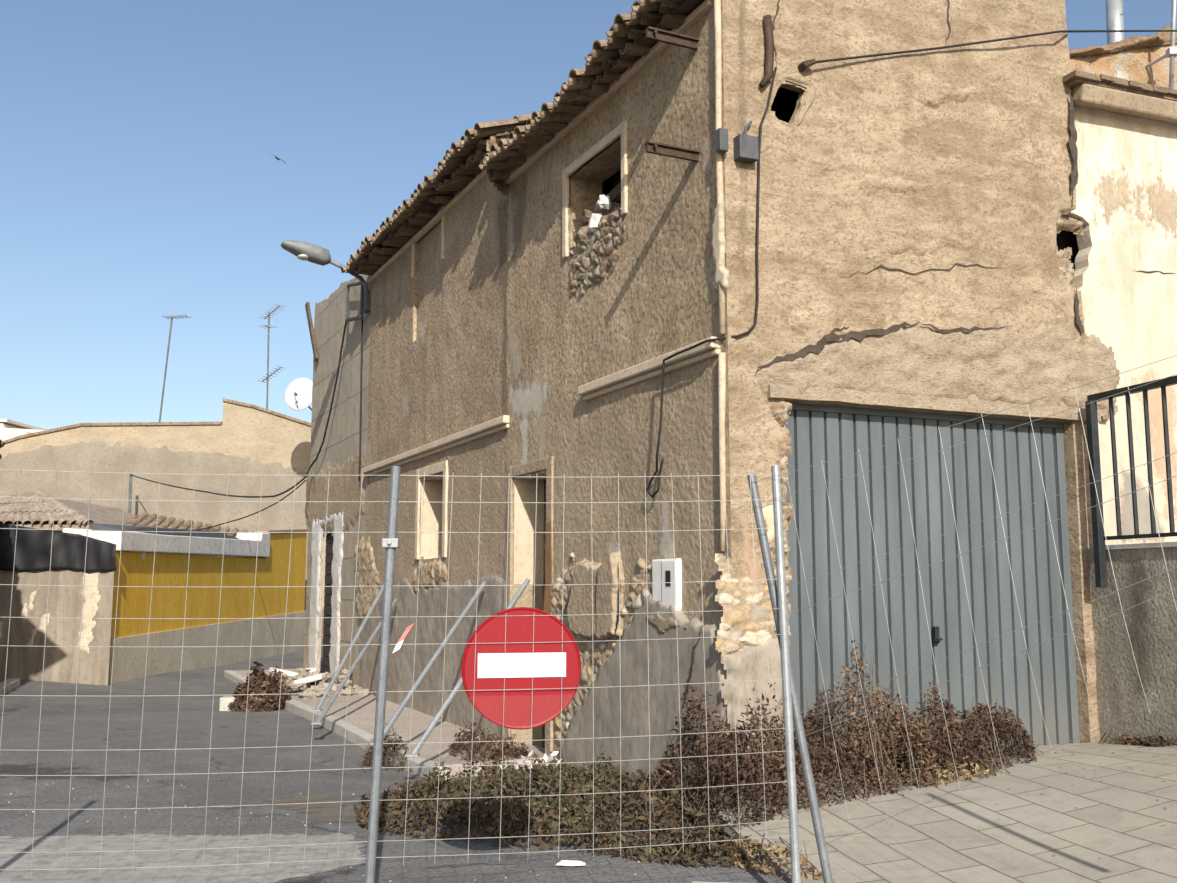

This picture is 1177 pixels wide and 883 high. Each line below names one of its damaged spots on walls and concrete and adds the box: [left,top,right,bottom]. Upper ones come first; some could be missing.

hole [784,73,816,126]
crack [841,263,1007,277]
spalling [1048,167,1177,320]
crack [756,321,1012,373]
peeling [78,571,101,654]
flaking render [354,535,381,626]
peeling [551,499,688,749]